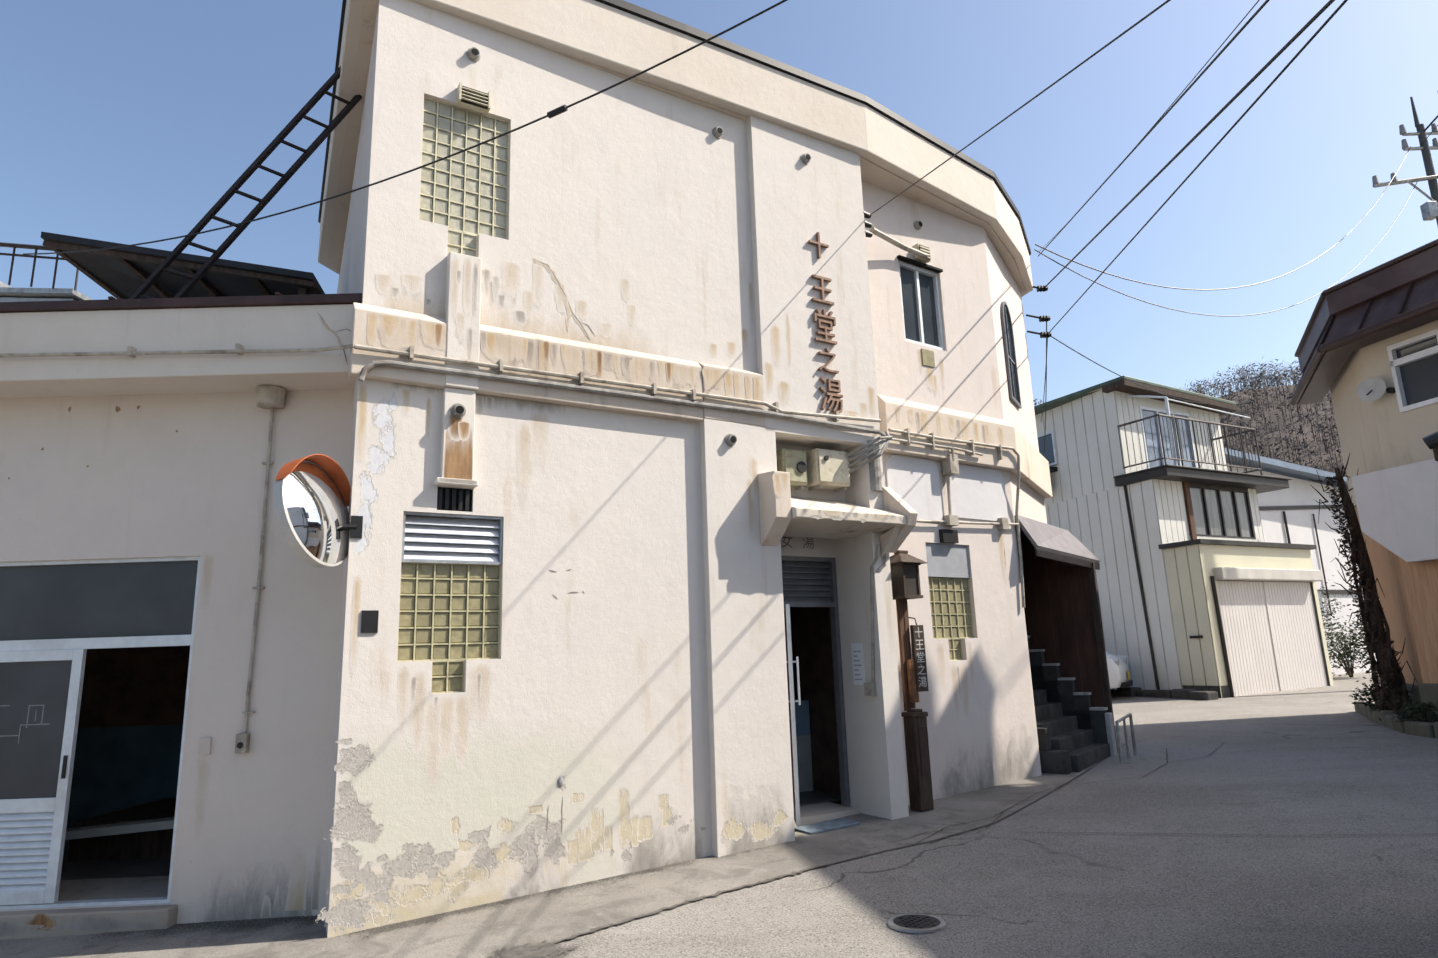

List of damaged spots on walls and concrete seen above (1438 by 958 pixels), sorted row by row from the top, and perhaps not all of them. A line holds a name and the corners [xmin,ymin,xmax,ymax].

leakage [374,257,698,392]
crack [533,258,595,341]
peeling [353,391,398,555]
flaking render [314,738,789,934]